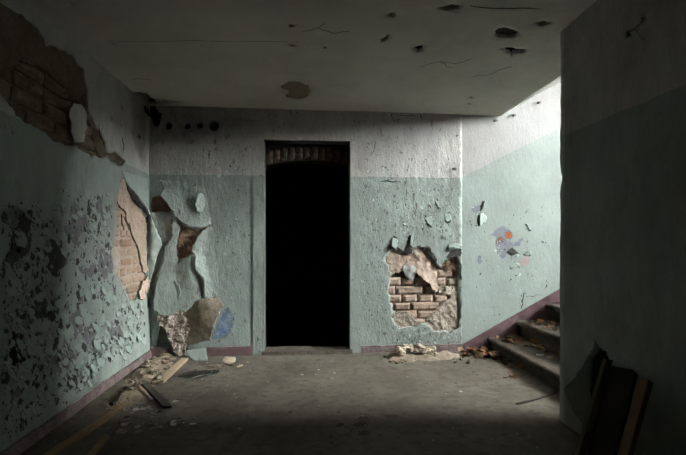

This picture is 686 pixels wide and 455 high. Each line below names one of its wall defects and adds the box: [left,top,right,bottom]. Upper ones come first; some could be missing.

spalling [495,27,518,36]
spalling [281,81,309,98]
peeling [0,3,253,444]
flaking render [360,181,463,345]
peeling [470,201,536,300]